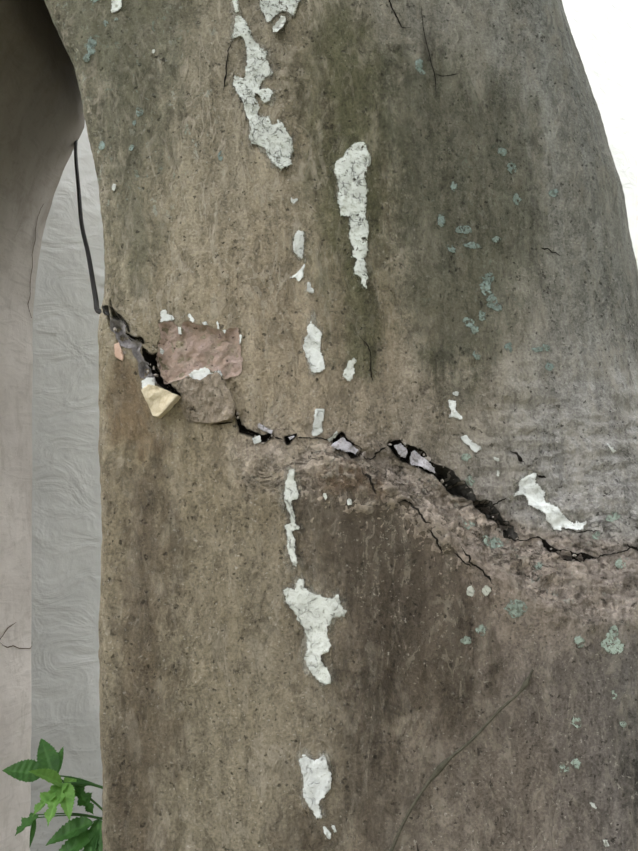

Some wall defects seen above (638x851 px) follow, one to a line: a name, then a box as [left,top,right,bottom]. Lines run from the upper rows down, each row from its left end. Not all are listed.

peeling [230,0,294,172]
peeling [257,0,302,32]
crack [388,0,456,90]
peeling [331,142,371,289]
crack [102,305,181,396]
spalling [156,310,243,384]
peeling [303,311,325,374]
peeling [280,466,346,686]
crack [218,410,638,564]
crack [398,499,494,585]
peeling [509,470,588,531]
peeling [297,750,337,839]